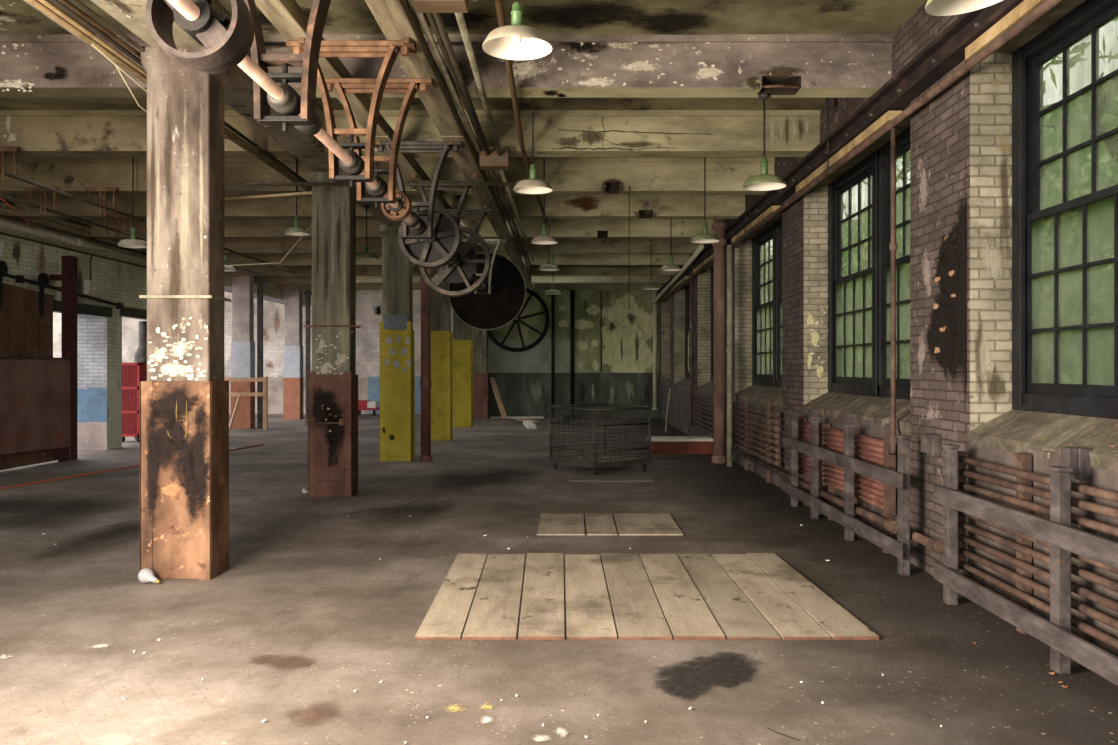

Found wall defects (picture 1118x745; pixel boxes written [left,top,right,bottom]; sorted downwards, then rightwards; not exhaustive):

peeling [0,79,35,92]
peeling [513,59,566,97]
peeling [561,42,725,87]
peeling [917,158,929,215]
peeling [920,235,956,310]
peeling [148,317,208,381]
peeling [316,331,353,375]
peeling [384,335,412,373]
peeling [917,329,940,373]
peeling [922,404,942,420]
corrosion [160,482,181,499]